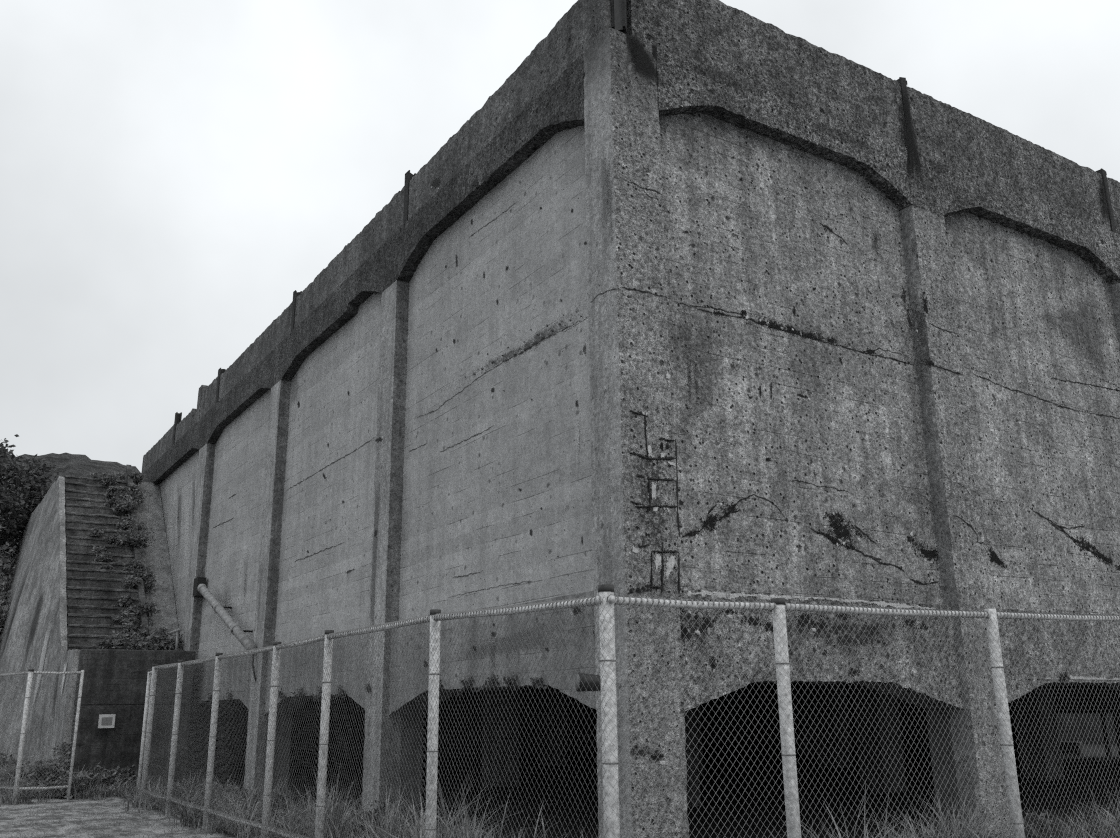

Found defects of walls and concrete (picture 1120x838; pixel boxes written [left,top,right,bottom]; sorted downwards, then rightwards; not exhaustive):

crack [417,287,1120,419]
crack [409,426,492,452]
crack [683,480,848,537]
spalling [628,410,938,678]
crack [811,525,939,585]
crack [1028,506,1119,566]